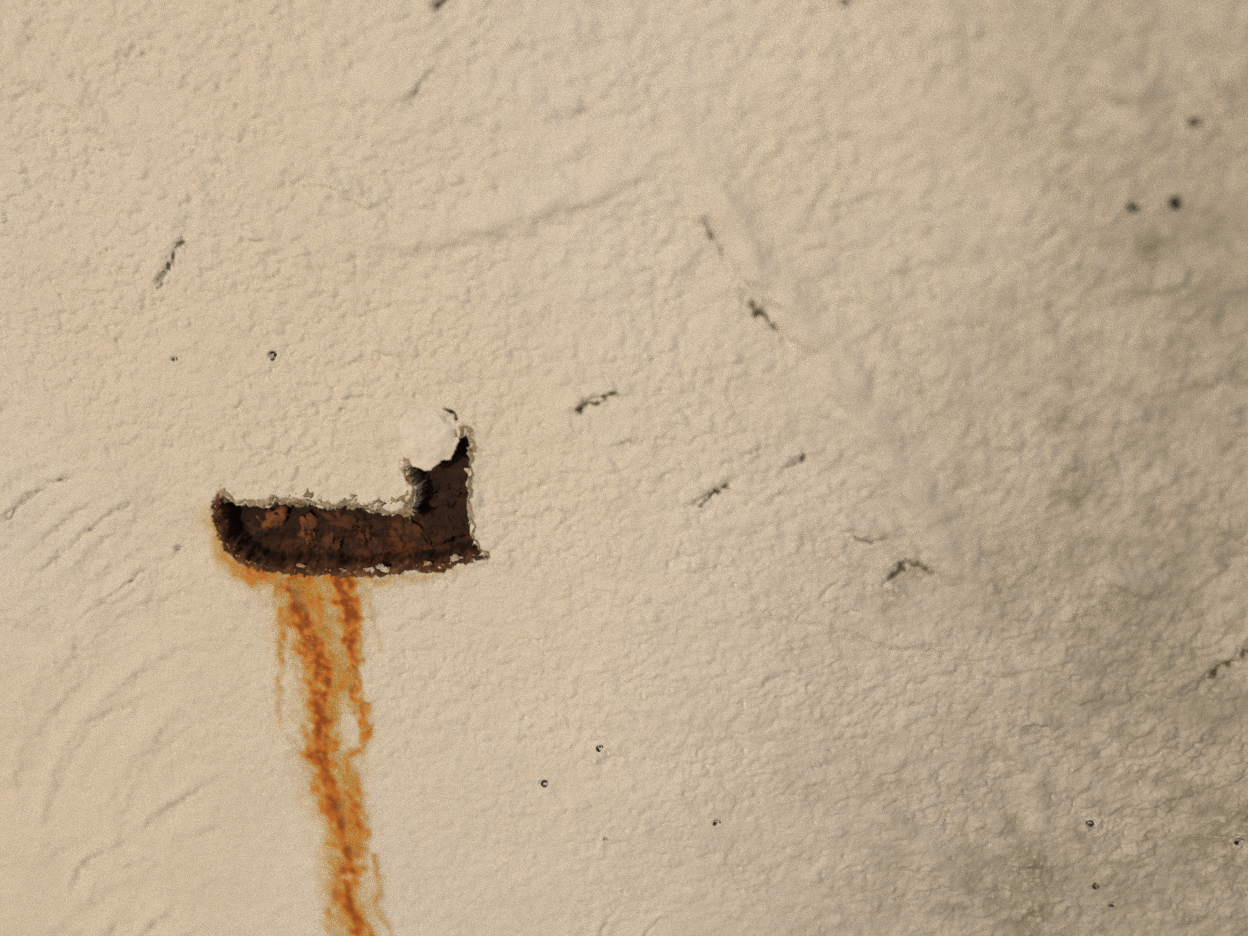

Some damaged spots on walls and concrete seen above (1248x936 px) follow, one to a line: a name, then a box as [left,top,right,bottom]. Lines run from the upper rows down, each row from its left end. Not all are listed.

flaking render [211,407,490,579]
rust [212,522,391,936]